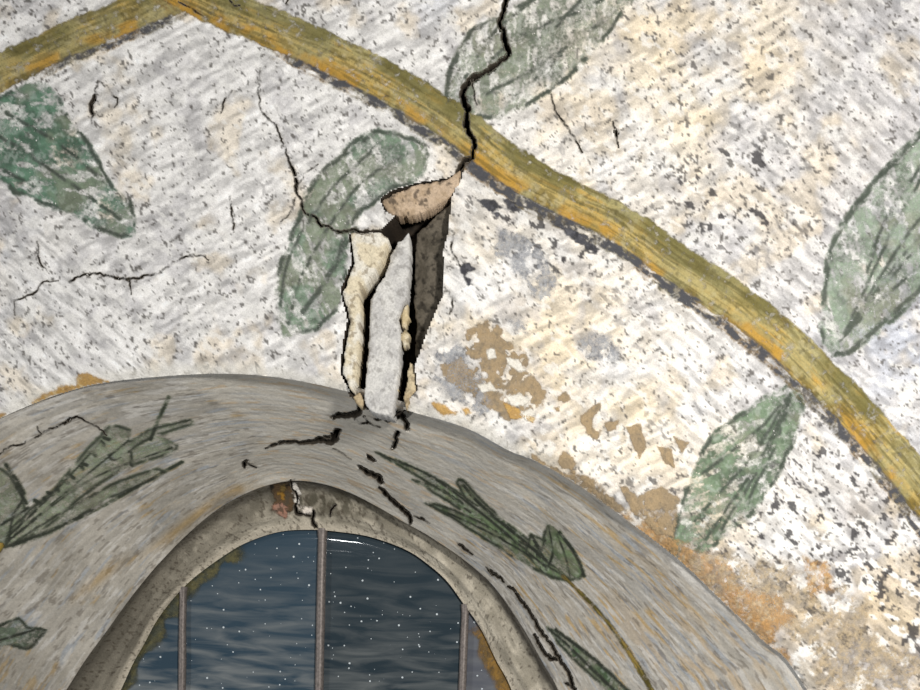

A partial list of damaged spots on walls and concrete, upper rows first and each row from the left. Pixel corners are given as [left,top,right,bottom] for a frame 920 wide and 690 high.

crack [257,84,382,235]
crack [455,0,512,180]
crack [551,93,583,153]
crack [611,121,619,148]
spalling [341,170,464,423]
crack [243,406,428,529]
peeling [440,320,546,423]
peeling [555,392,570,411]
peeling [581,403,646,459]
peeling [658,436,689,468]
crack [458,543,577,690]